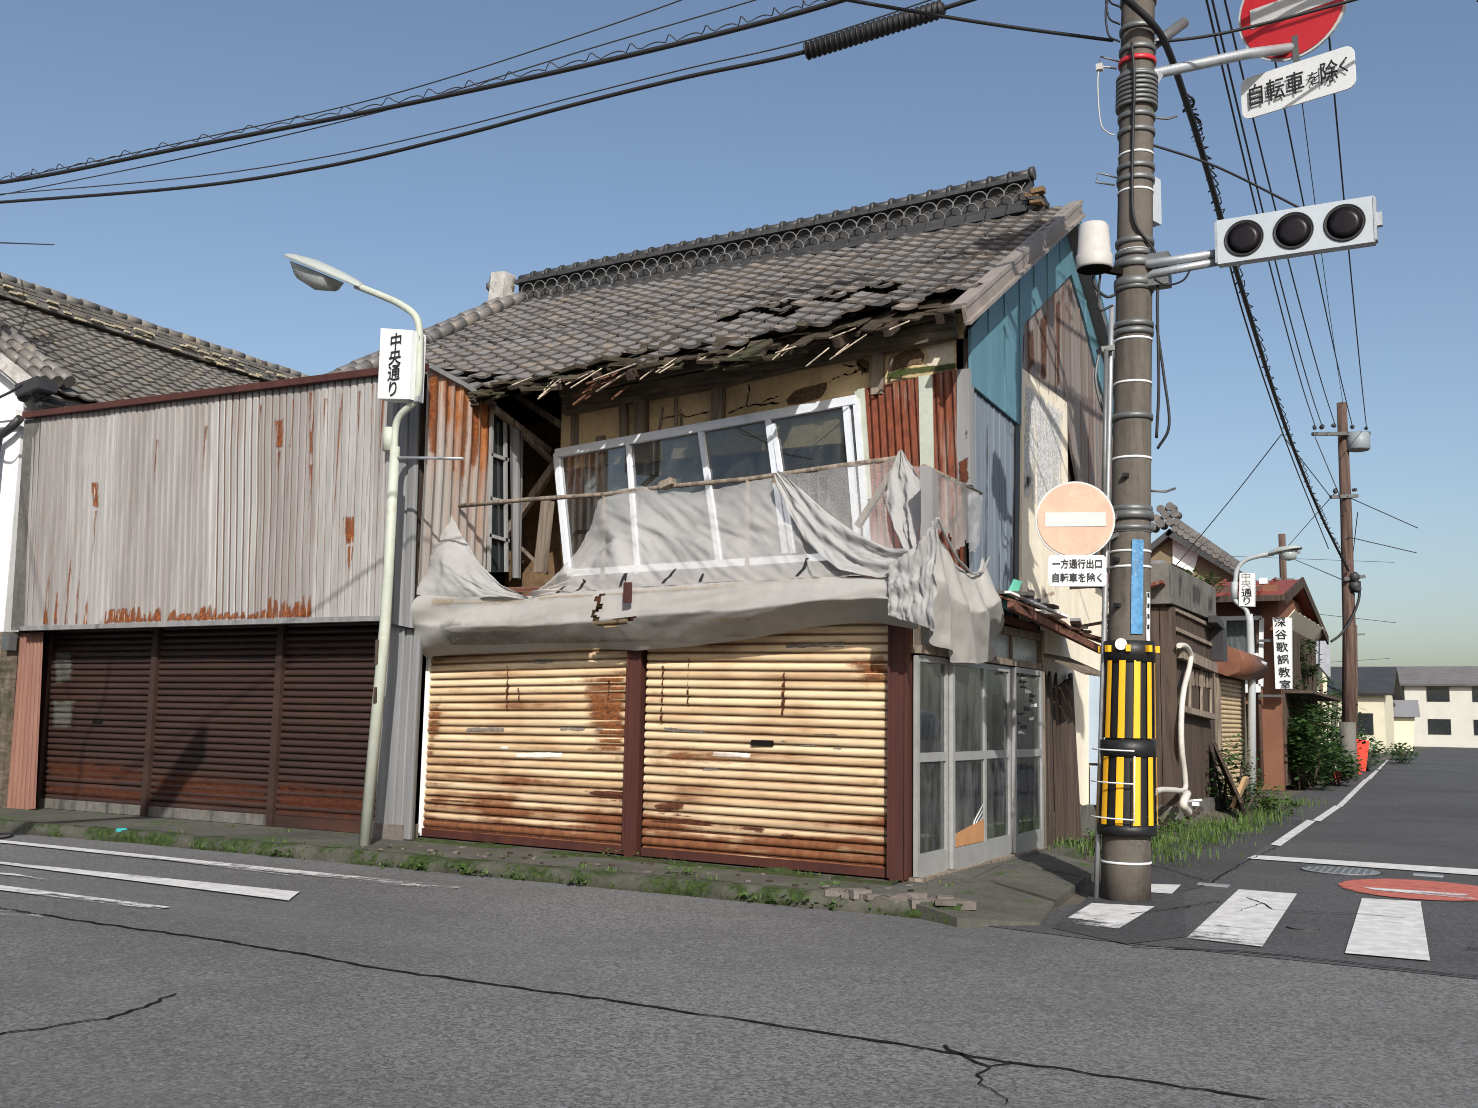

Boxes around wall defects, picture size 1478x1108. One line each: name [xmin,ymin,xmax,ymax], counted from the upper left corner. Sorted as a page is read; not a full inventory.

corrosion [259,385,384,569]
corrosion [43,564,311,624]
corrosion [851,656,886,681]
corrosion [428,708,441,755]
corrosion [585,673,626,750]
corrosion [668,752,717,760]